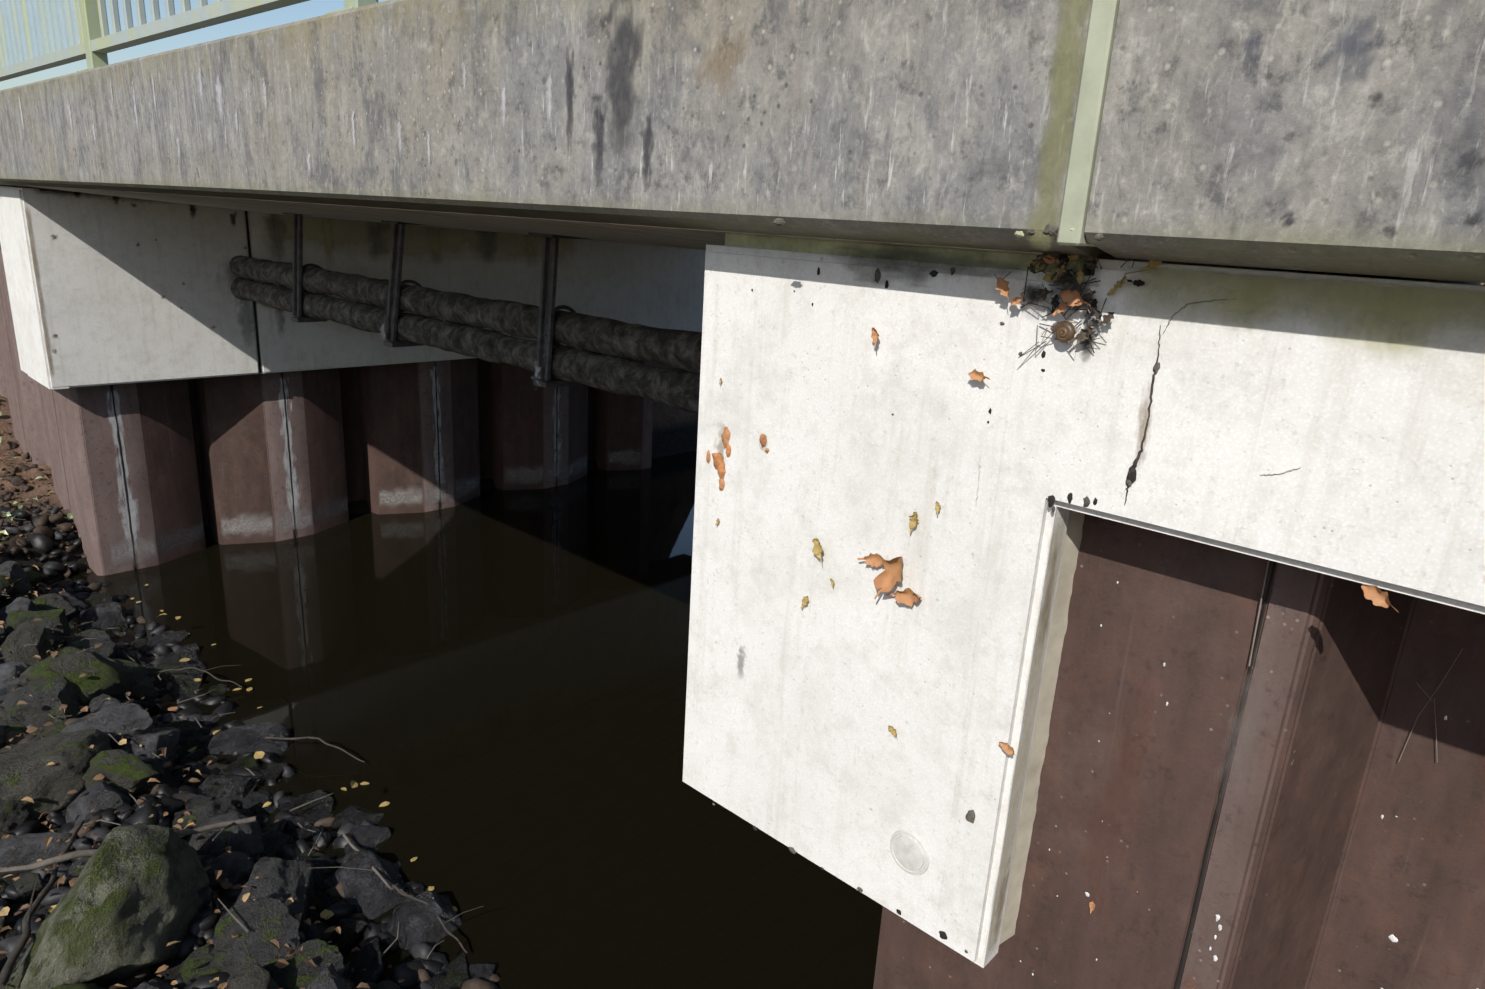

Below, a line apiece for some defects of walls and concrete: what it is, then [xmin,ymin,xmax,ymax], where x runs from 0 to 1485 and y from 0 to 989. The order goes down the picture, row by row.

leakage [547,65,573,129]
leakage [593,12,640,161]
leakage [107,385,202,567]
leakage [222,373,347,536]
crack [1124,299,1236,505]